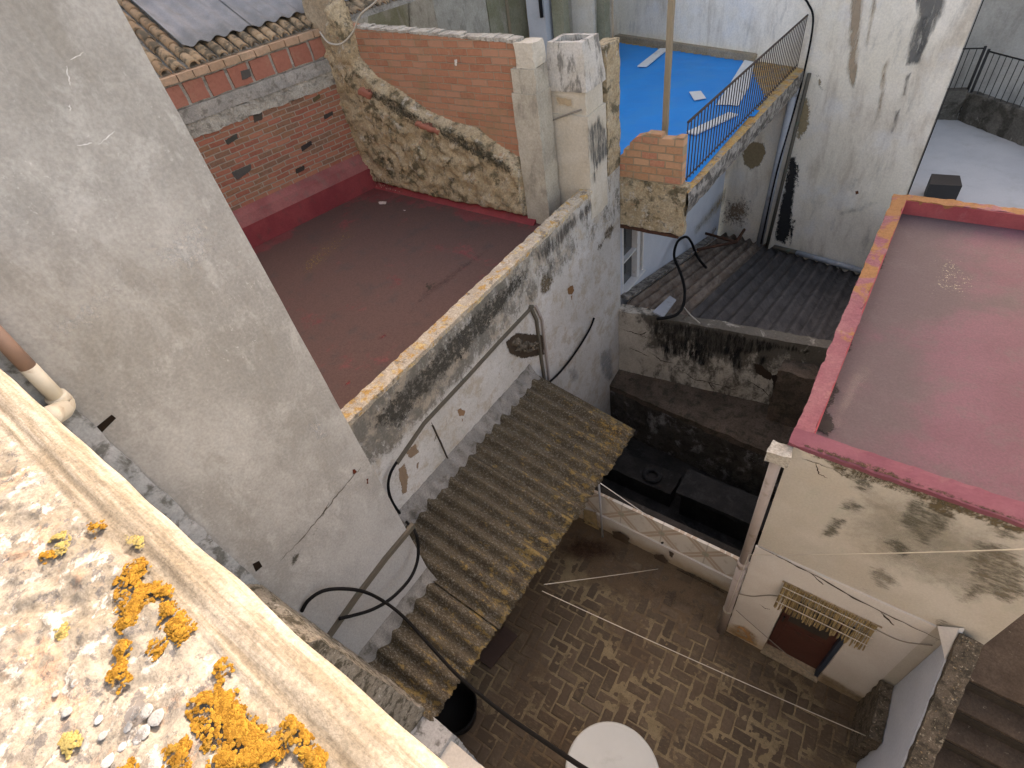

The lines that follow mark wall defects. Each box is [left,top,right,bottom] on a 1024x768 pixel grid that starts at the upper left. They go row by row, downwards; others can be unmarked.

leakage [904,0,944,91]
mould [588,119,607,180]
leakage [705,195,752,237]
leakage [775,154,800,244]
mould [375,269,527,427]
spalling [506,333,545,358]
leakage [651,321,809,369]
peeling [399,444,419,494]
leakage [804,445,1024,601]
crack [758,546,937,639]